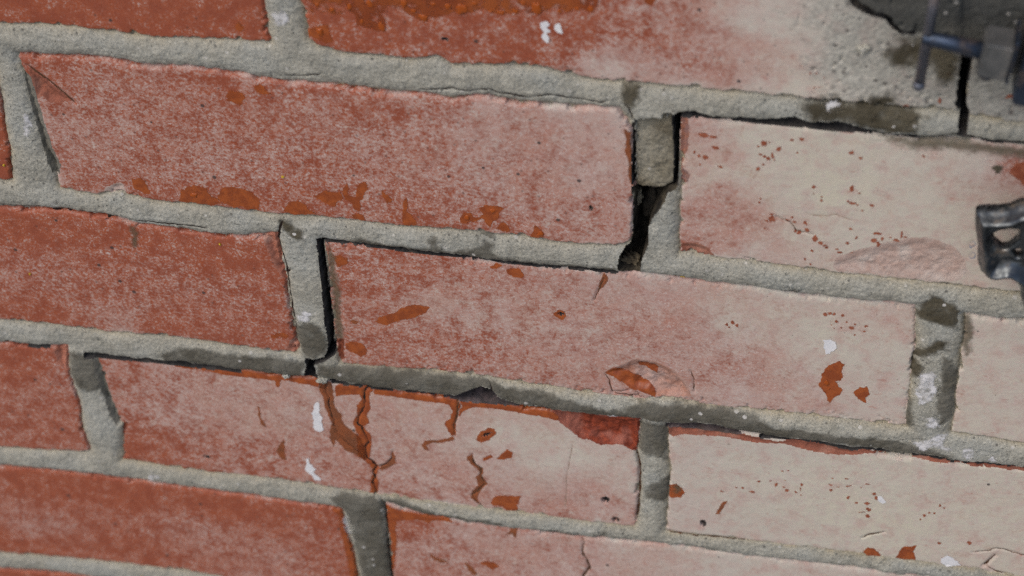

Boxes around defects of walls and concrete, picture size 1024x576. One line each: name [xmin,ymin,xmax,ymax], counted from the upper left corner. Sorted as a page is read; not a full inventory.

crack [672,55,1024,186]
water stain [804,97,1024,185]
crack [304,238,618,576]
spalling [405,386,641,451]
water stain [162,252,973,576]
spalling [605,358,691,397]